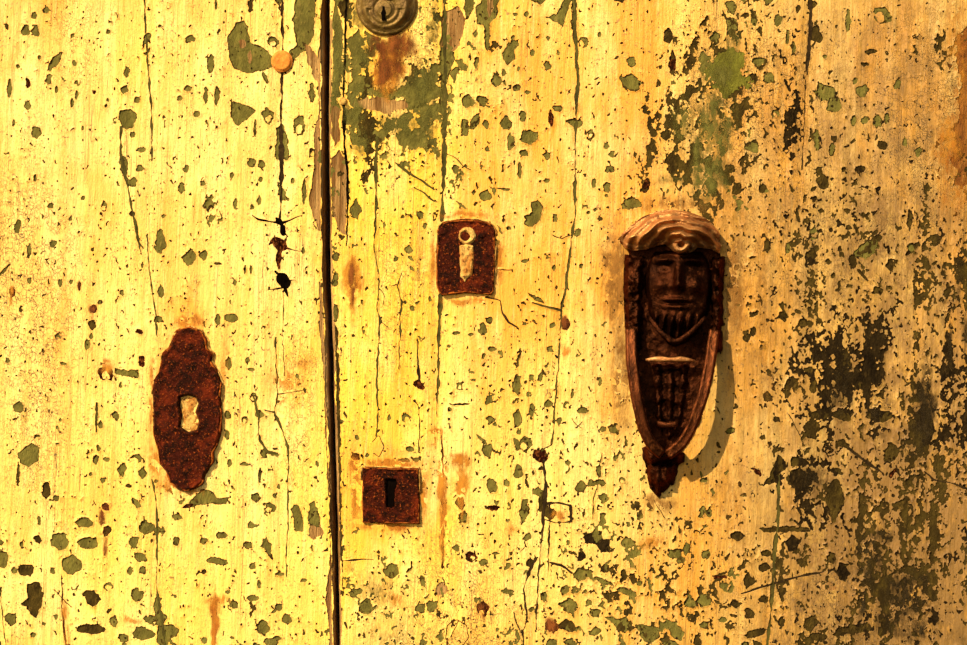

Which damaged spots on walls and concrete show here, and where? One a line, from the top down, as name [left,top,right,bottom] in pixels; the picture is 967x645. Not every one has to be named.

peeling [4,4,55,43]
peeling [7,52,99,158]
peeling [66,6,132,56]
peeling [105,44,141,138]
corrosion [371,32,415,94]
crack [252,0,307,577]
crack [513,0,603,645]
peeling [282,0,967,645]
corrosion [350,457,417,515]